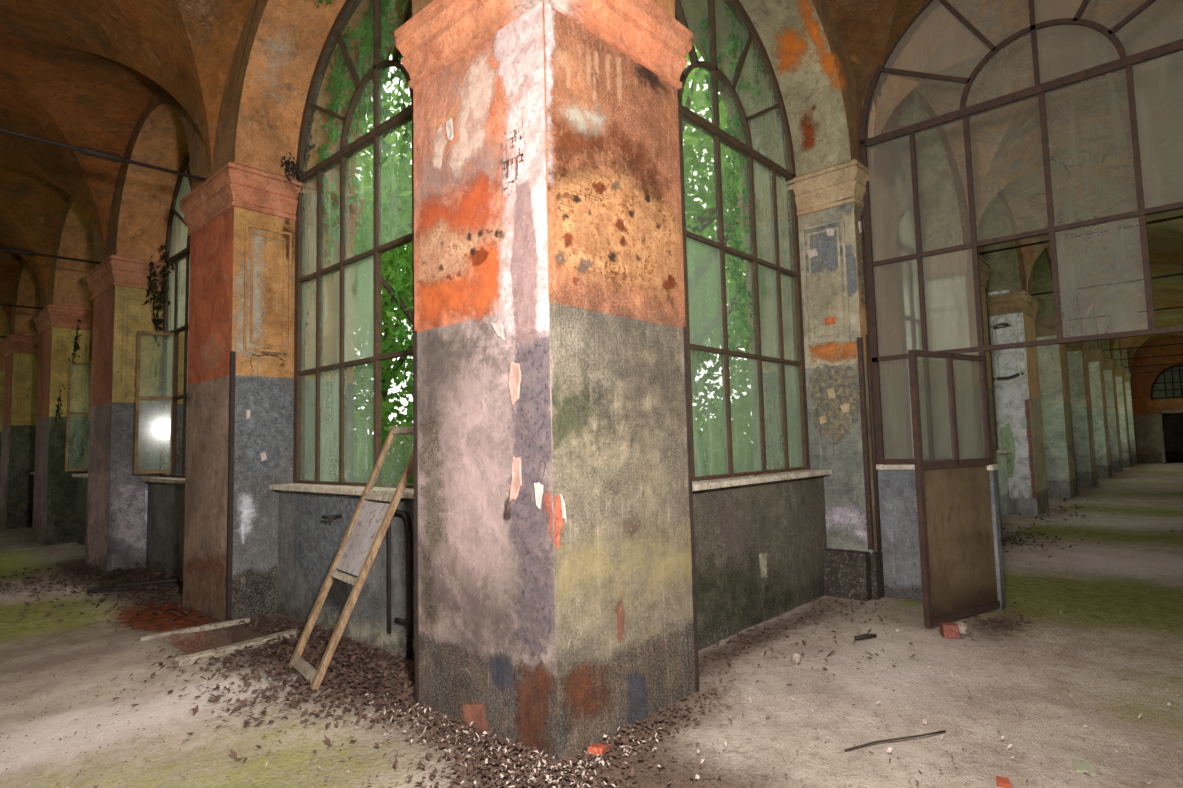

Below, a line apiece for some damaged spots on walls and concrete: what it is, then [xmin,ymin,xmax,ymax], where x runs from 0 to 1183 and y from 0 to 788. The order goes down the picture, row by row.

peeling [806,198,869,307]
flaking render [417,2,682,656]
peeling [810,365,860,444]